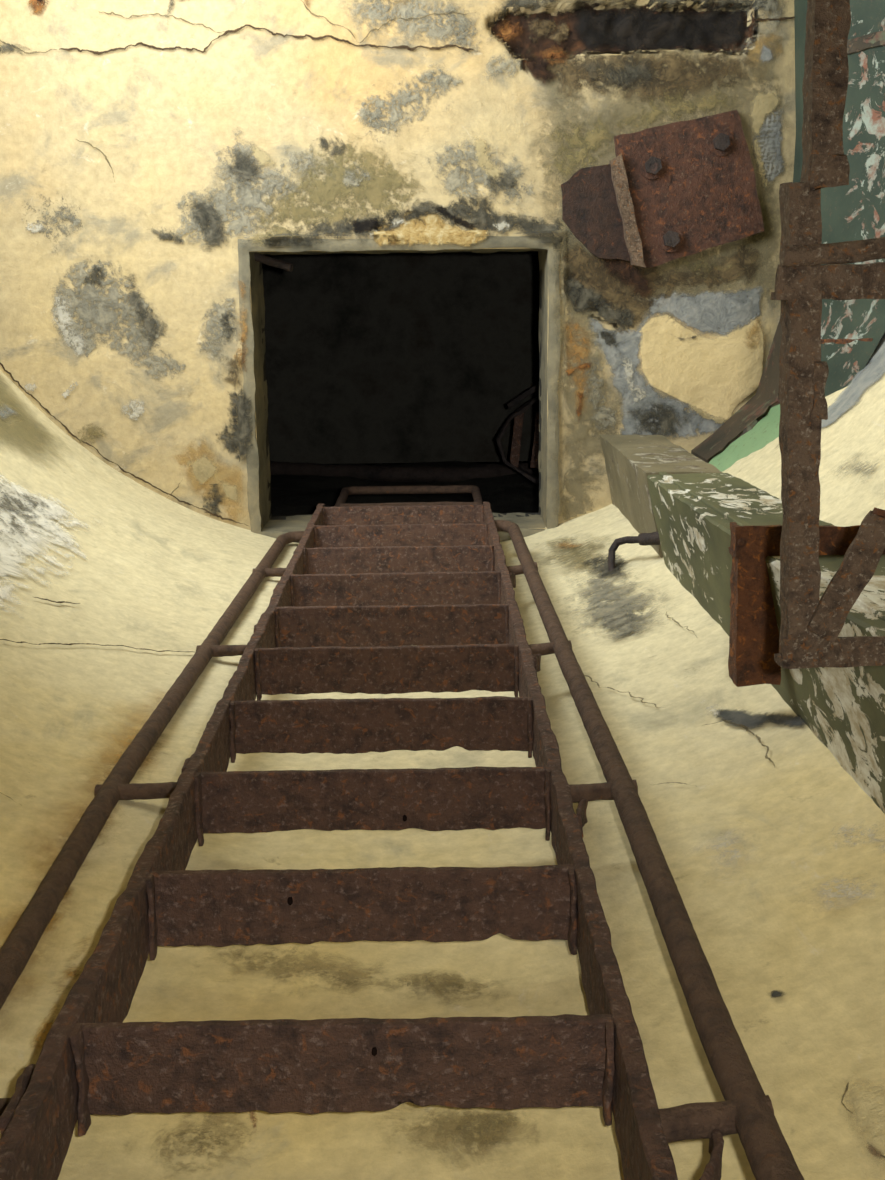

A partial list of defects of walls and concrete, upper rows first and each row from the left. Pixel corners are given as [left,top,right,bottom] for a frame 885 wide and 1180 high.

corrosion [29,0,48,15]
crack [0,1,475,55]
corrosion [526,51,747,101]
water stain [153,0,785,520]
peeling [589,287,764,437]
water stain [0,381,49,450]
water stain [0,475,87,612]
water stain [546,538,654,638]
crack [0,639,193,652]
crack [584,675,661,708]
crack [702,720,775,766]